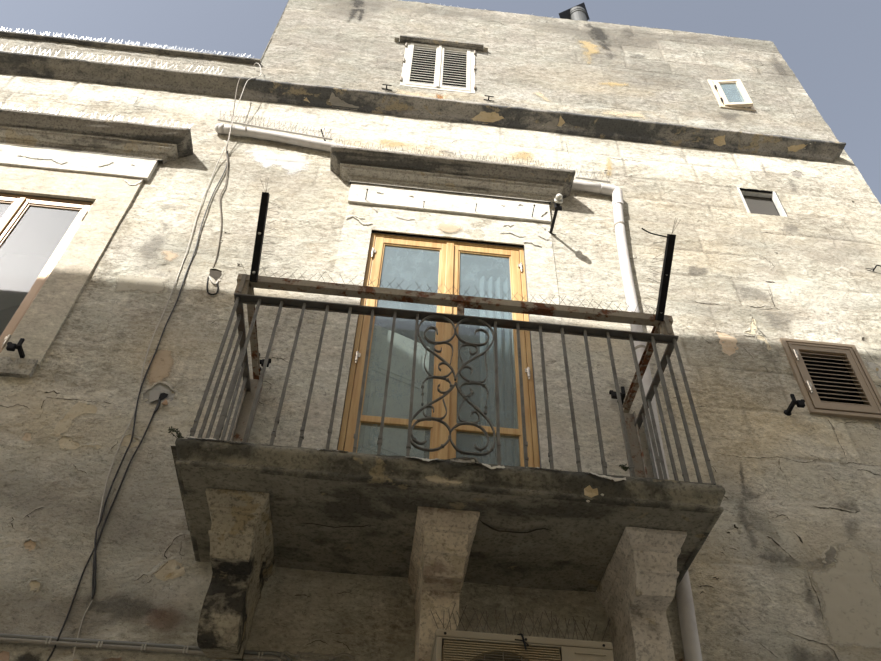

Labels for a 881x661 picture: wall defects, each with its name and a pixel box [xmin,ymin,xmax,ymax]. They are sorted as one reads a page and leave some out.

leakage [350,0,363,20]
flaking render [328,90,361,111]
flaking render [469,108,505,125]
flaking render [538,114,566,132]
flaking render [714,316,773,357]
crack [0,389,113,419]
crack [711,417,881,480]
crack [813,505,859,513]
crack [765,510,840,661]
leakage [17,653,40,661]